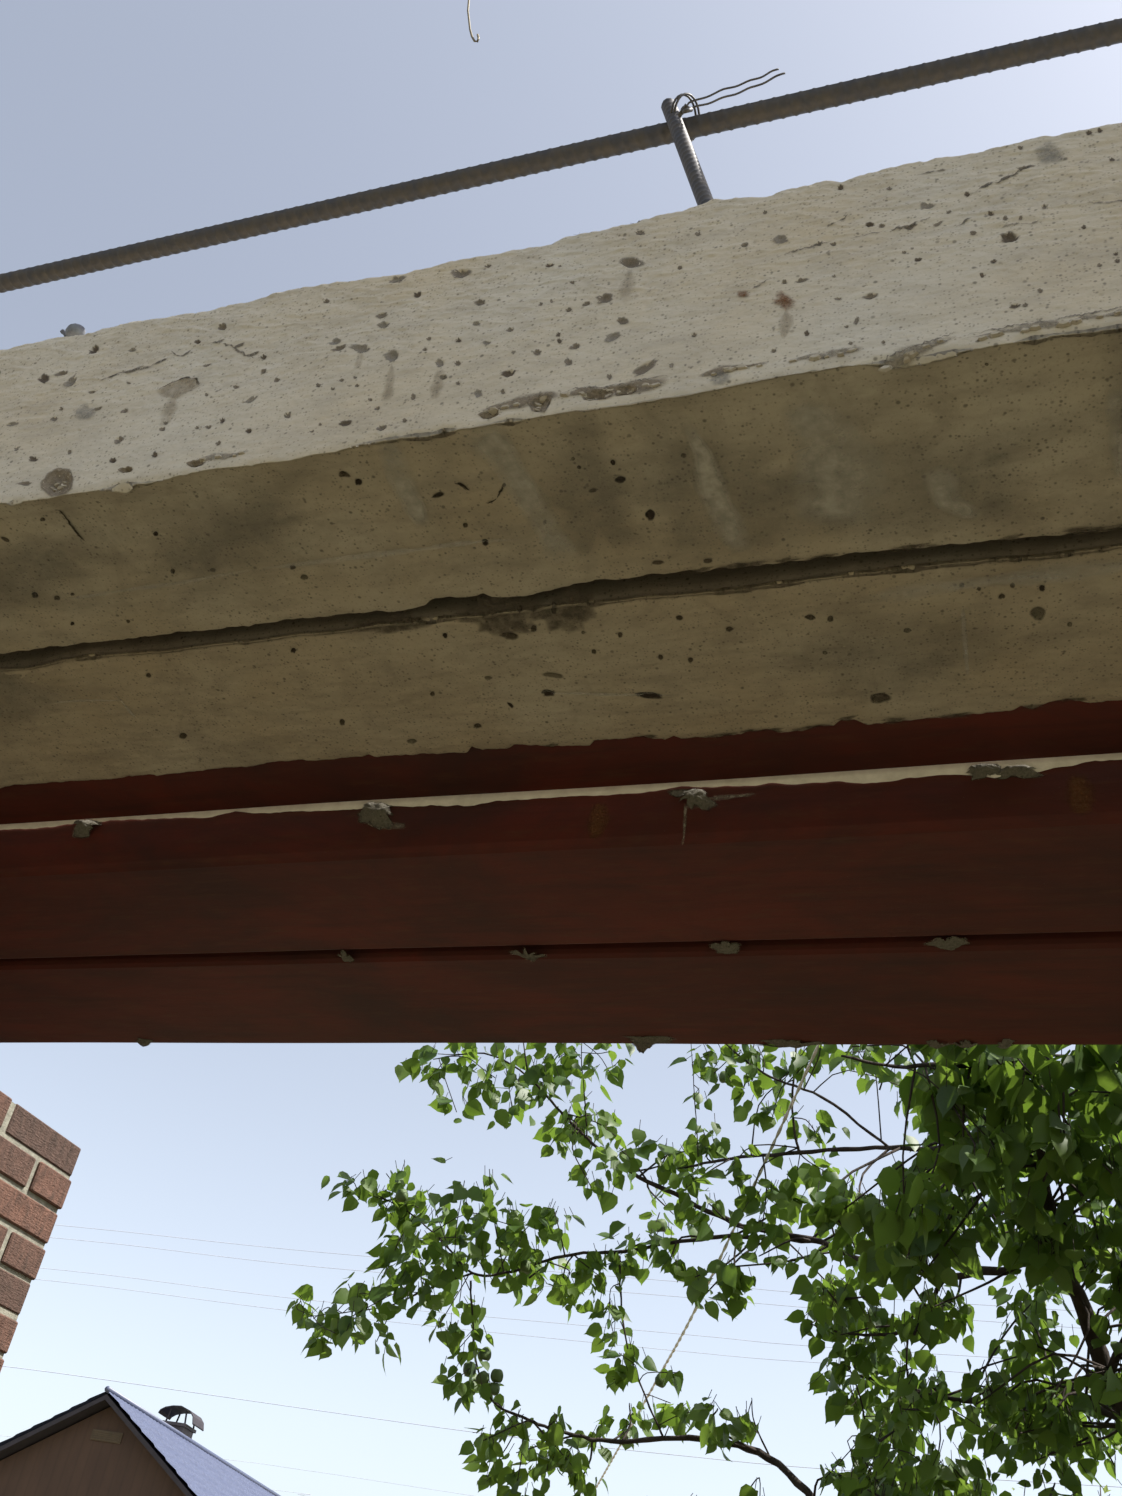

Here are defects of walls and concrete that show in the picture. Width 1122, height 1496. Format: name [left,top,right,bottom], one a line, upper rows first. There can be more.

spalling [977,289,1122,341]
spalling [703,317,859,376]
spalling [877,335,949,372]
leakage [692,439,737,540]